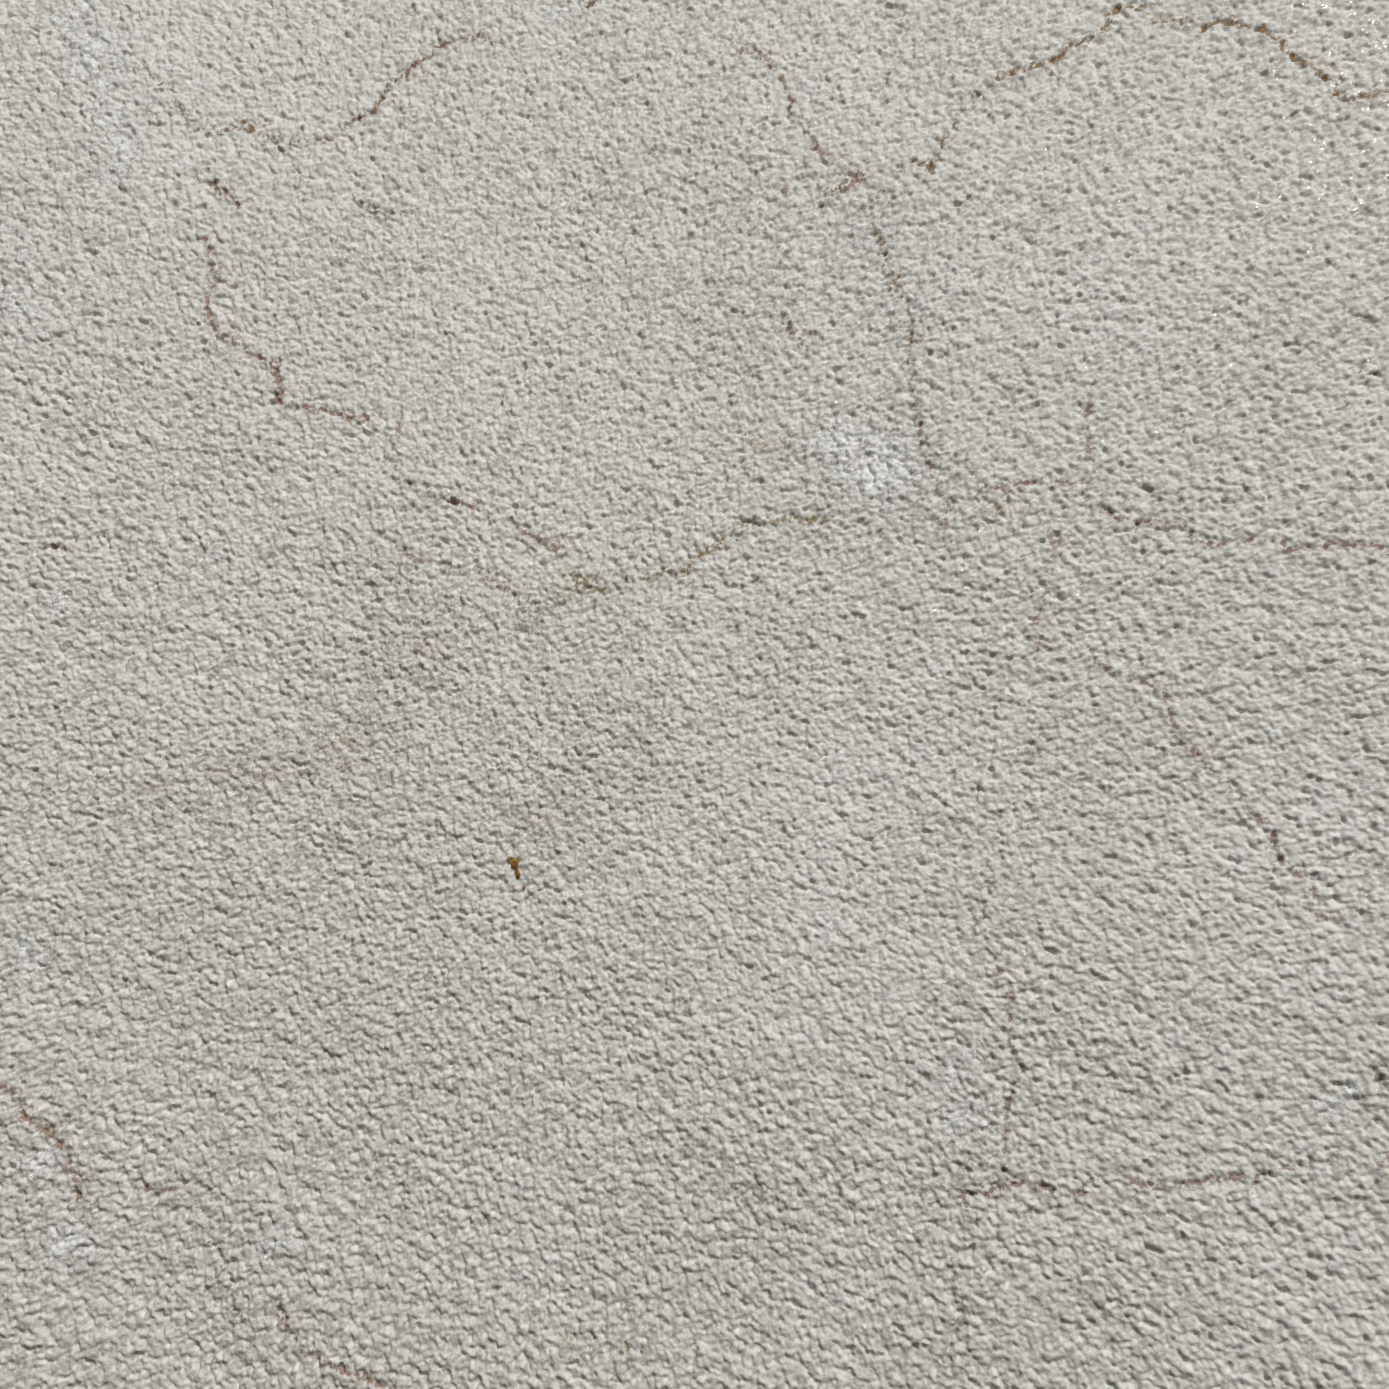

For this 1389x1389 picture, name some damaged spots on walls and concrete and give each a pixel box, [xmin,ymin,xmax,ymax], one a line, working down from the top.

crack [211,180,241,207]
crack [152,33,493,147]
crack [728,39,865,208]
crack [900,3,1389,175]
crack [189,227,475,510]
crack [867,218,1389,591]
crack [508,511,852,596]
rust [414,690,691,905]
crack [1026,541,1348,918]
crack [0,1085,177,1227]
crack [919,957,1389,1204]
crack [277,1297,391,1389]